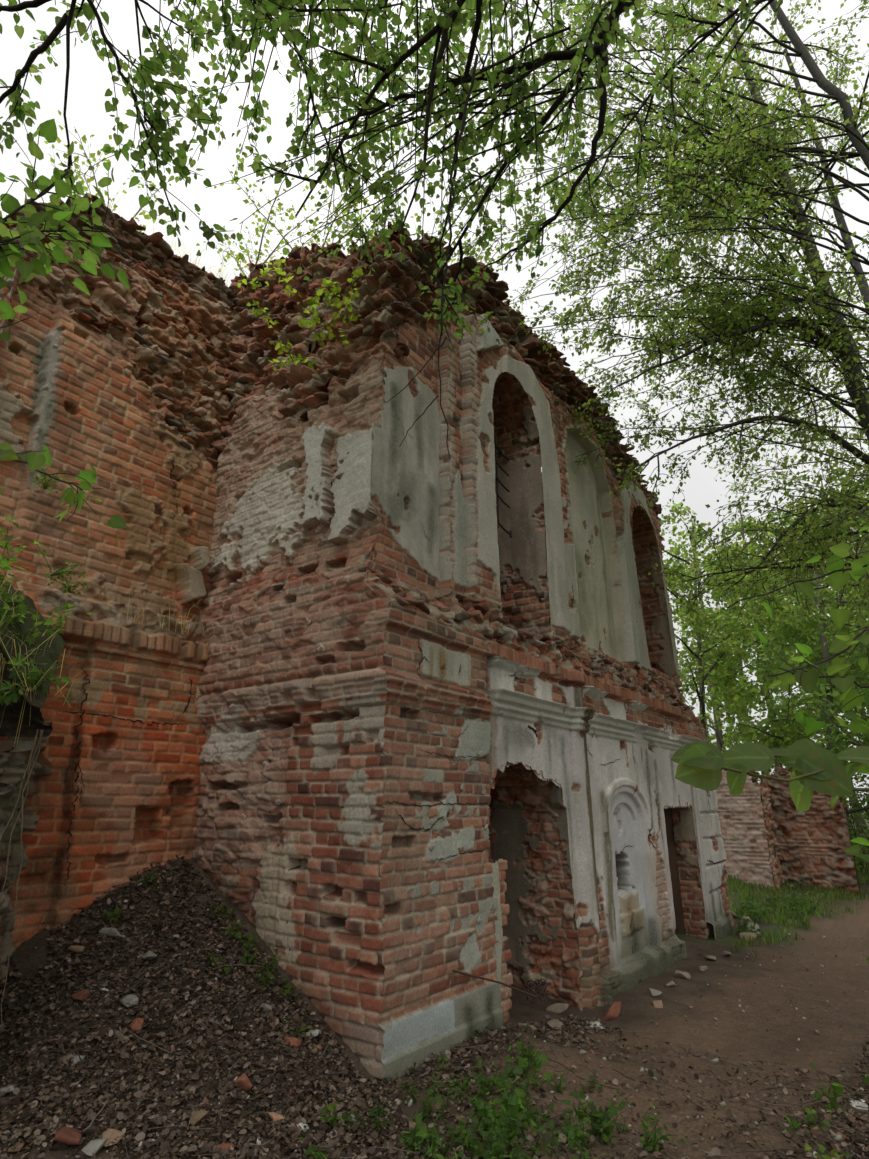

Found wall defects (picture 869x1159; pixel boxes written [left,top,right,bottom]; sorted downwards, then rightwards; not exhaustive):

spalling [0,197,708,742]
crack [61,667,195,895]
crack [386,801,489,863]
flaking render [574,874,622,1009]